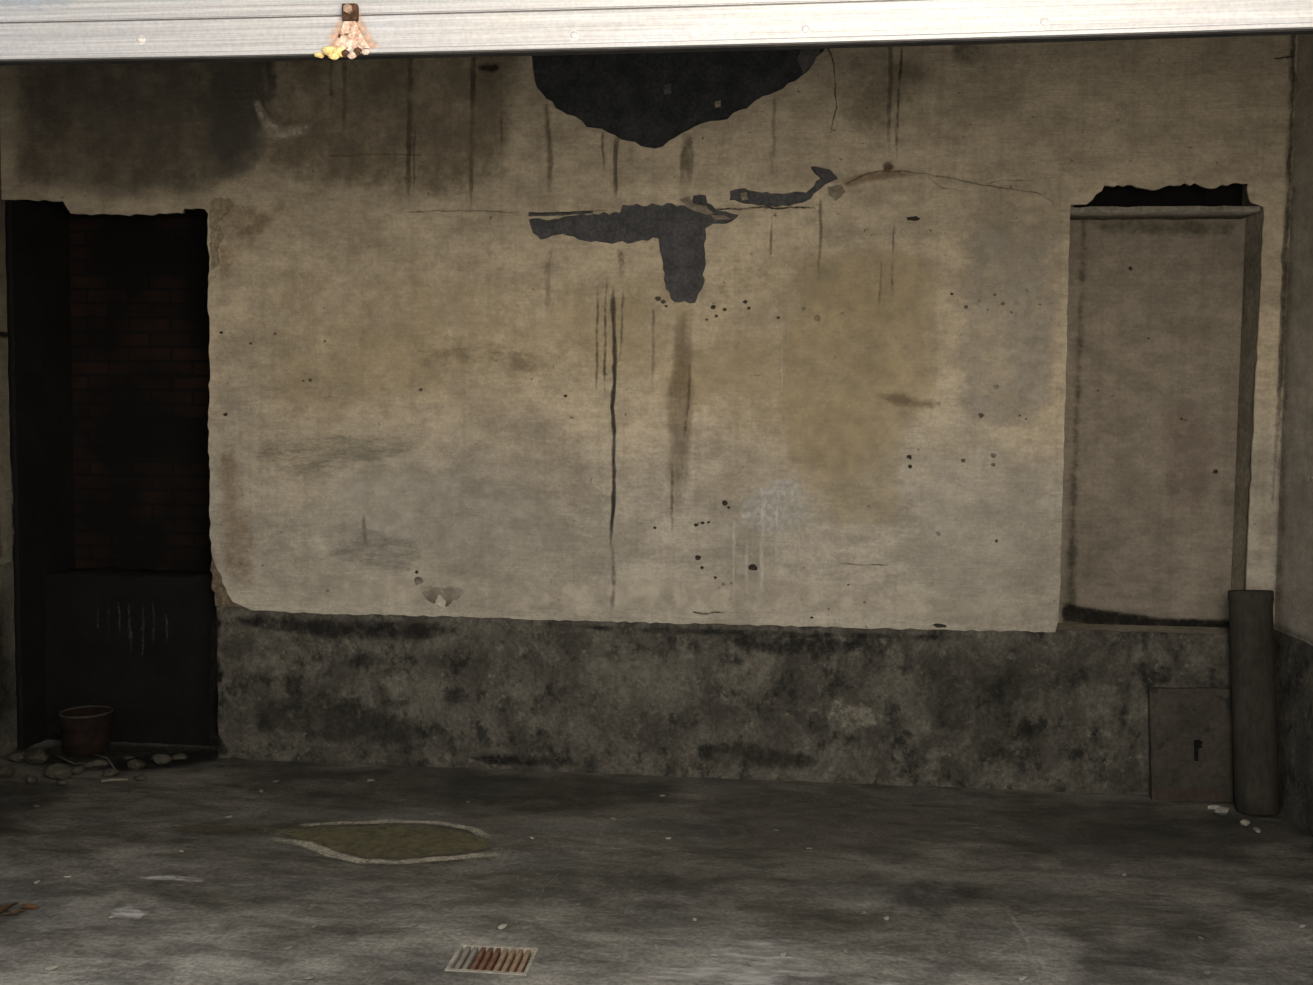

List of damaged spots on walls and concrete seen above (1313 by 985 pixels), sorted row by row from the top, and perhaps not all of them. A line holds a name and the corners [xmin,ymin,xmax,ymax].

spalling [532,49,824,148]
spalling [1074,184,1243,208]
spalling [528,167,845,308]
water stain [238,618,456,667]
water stain [679,630,885,653]
water stain [827,698,877,732]
water stain [472,755,547,765]